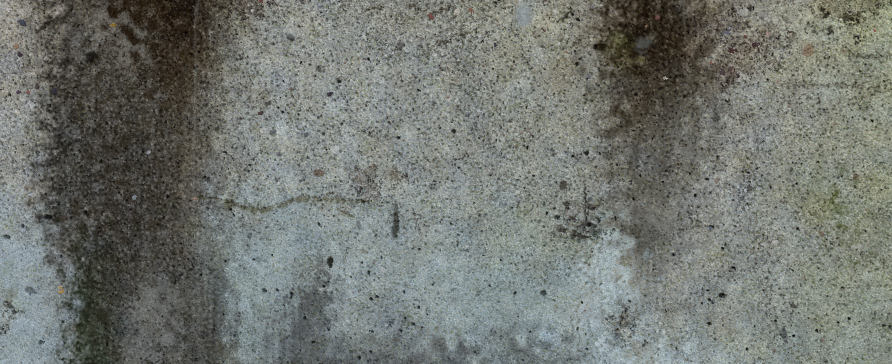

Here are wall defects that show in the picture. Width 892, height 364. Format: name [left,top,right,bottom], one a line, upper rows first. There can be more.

damp [191,0,302,248]
crack [195,191,370,220]
damp [67,247,206,364]
damp [679,318,704,364]